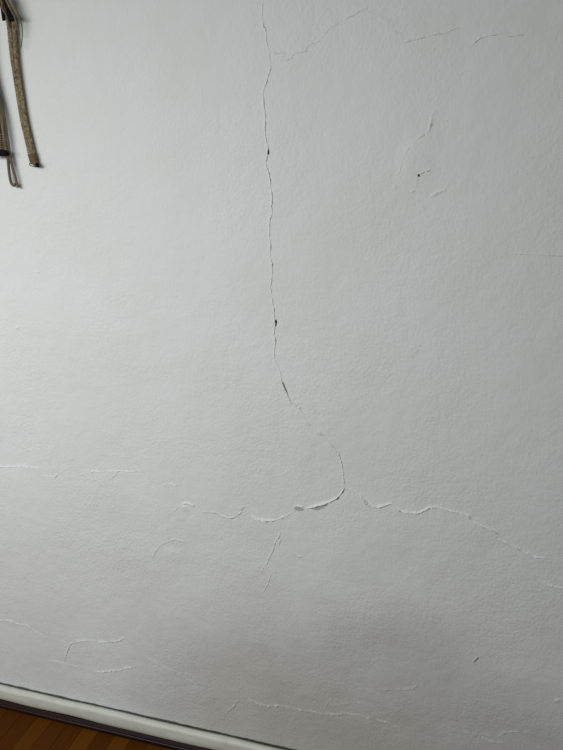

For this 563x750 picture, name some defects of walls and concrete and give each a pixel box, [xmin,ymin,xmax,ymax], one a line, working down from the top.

crack [199,0,563,592]